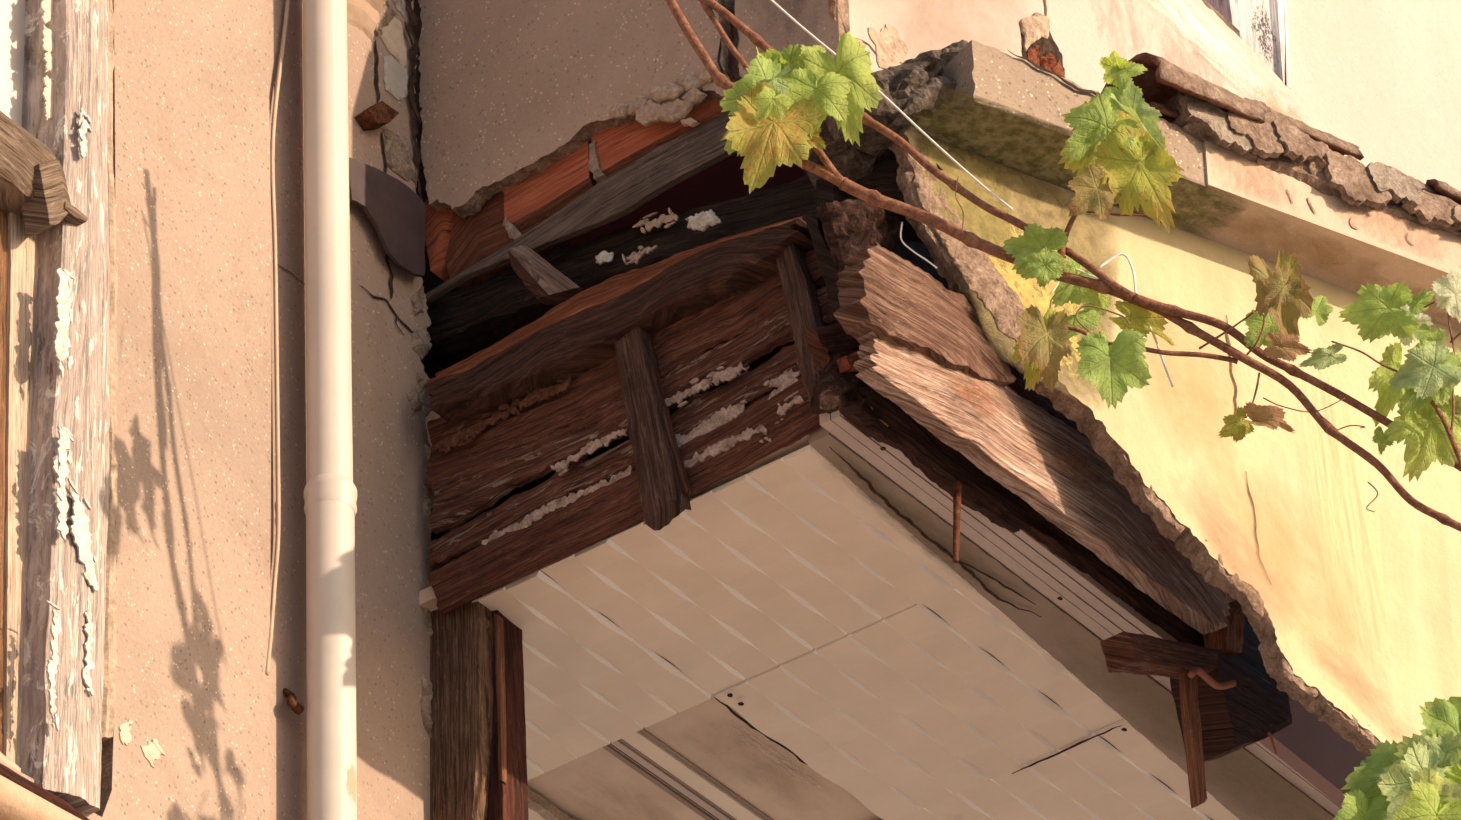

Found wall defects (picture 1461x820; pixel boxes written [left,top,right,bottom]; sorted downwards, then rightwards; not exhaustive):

peeling [77,107,92,159]
crack [374,0,423,201]
flaking render [608,64,713,128]
peeling [53,268,75,379]
crack [360,254,413,335]
peeling [52,425,99,591]
peeling [45,600,62,731]
peeling [81,610,95,696]